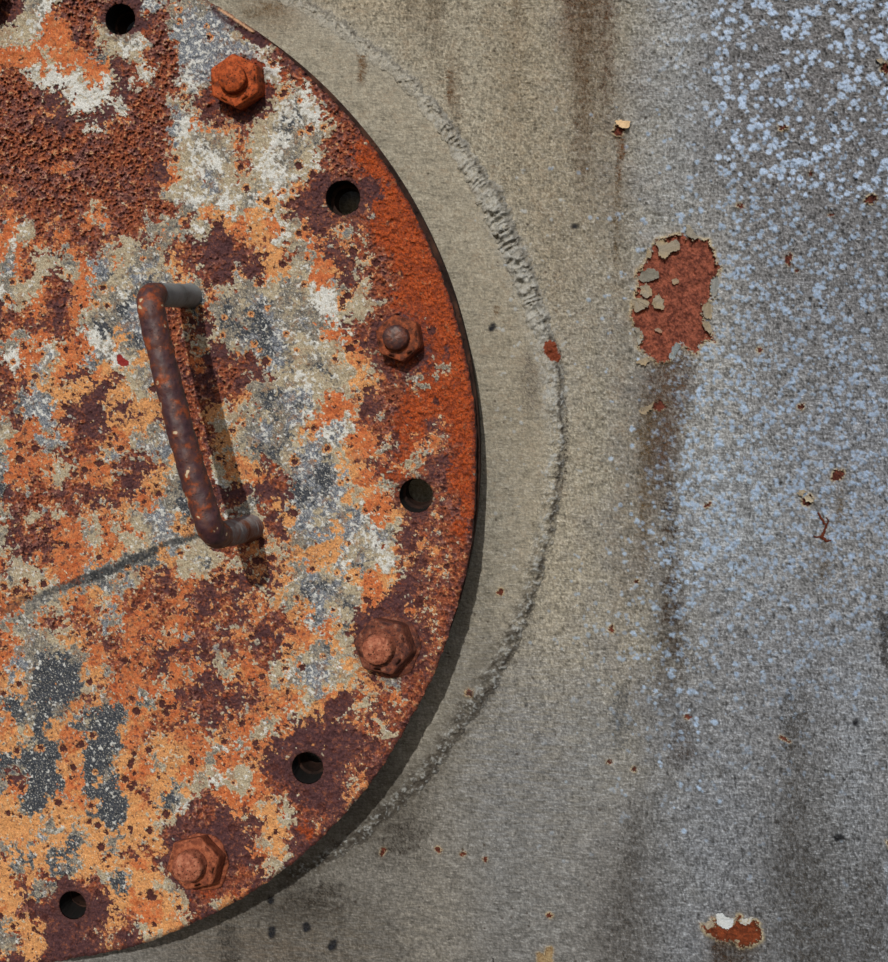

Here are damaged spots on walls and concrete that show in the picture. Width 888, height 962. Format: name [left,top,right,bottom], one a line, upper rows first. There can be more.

rust [0,39,180,244]
peeling [613,120,630,135]
rust [189,220,266,286]
peeling [631,224,720,366]
rust [189,339,260,415]
rust [281,103,476,697]
rust [0,471,111,573]
rust [252,470,295,510]
rust [259,714,373,850]
rust [140,788,260,925]
rust [26,876,114,962]
peeling [702,913,762,948]